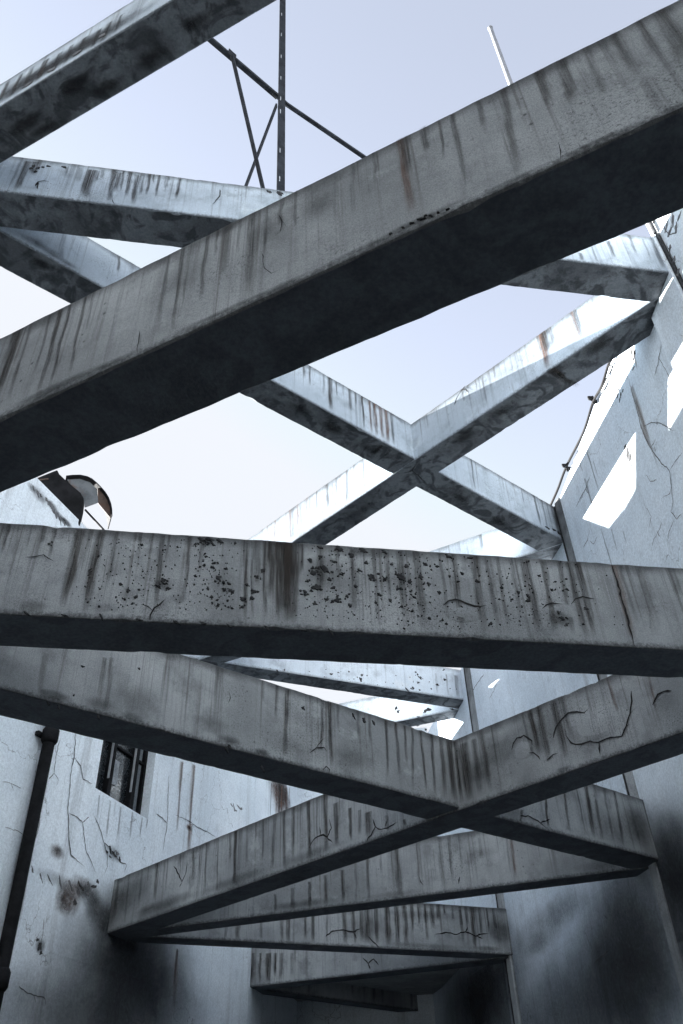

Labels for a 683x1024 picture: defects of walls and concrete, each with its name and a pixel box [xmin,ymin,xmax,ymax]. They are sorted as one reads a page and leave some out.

leakage [82,169,98,193]
leakage [109,169,160,199]
corrosion [538,331,548,362]
crack [630,386,682,558]
spalling [292,545,596,636]
crack [444,595,486,607]
crack [512,690,671,760]
crack [49,733,127,869]
crack [309,820,332,847]
leakage [61,888,77,910]
crack [326,929,380,968]
crack [439,927,488,939]